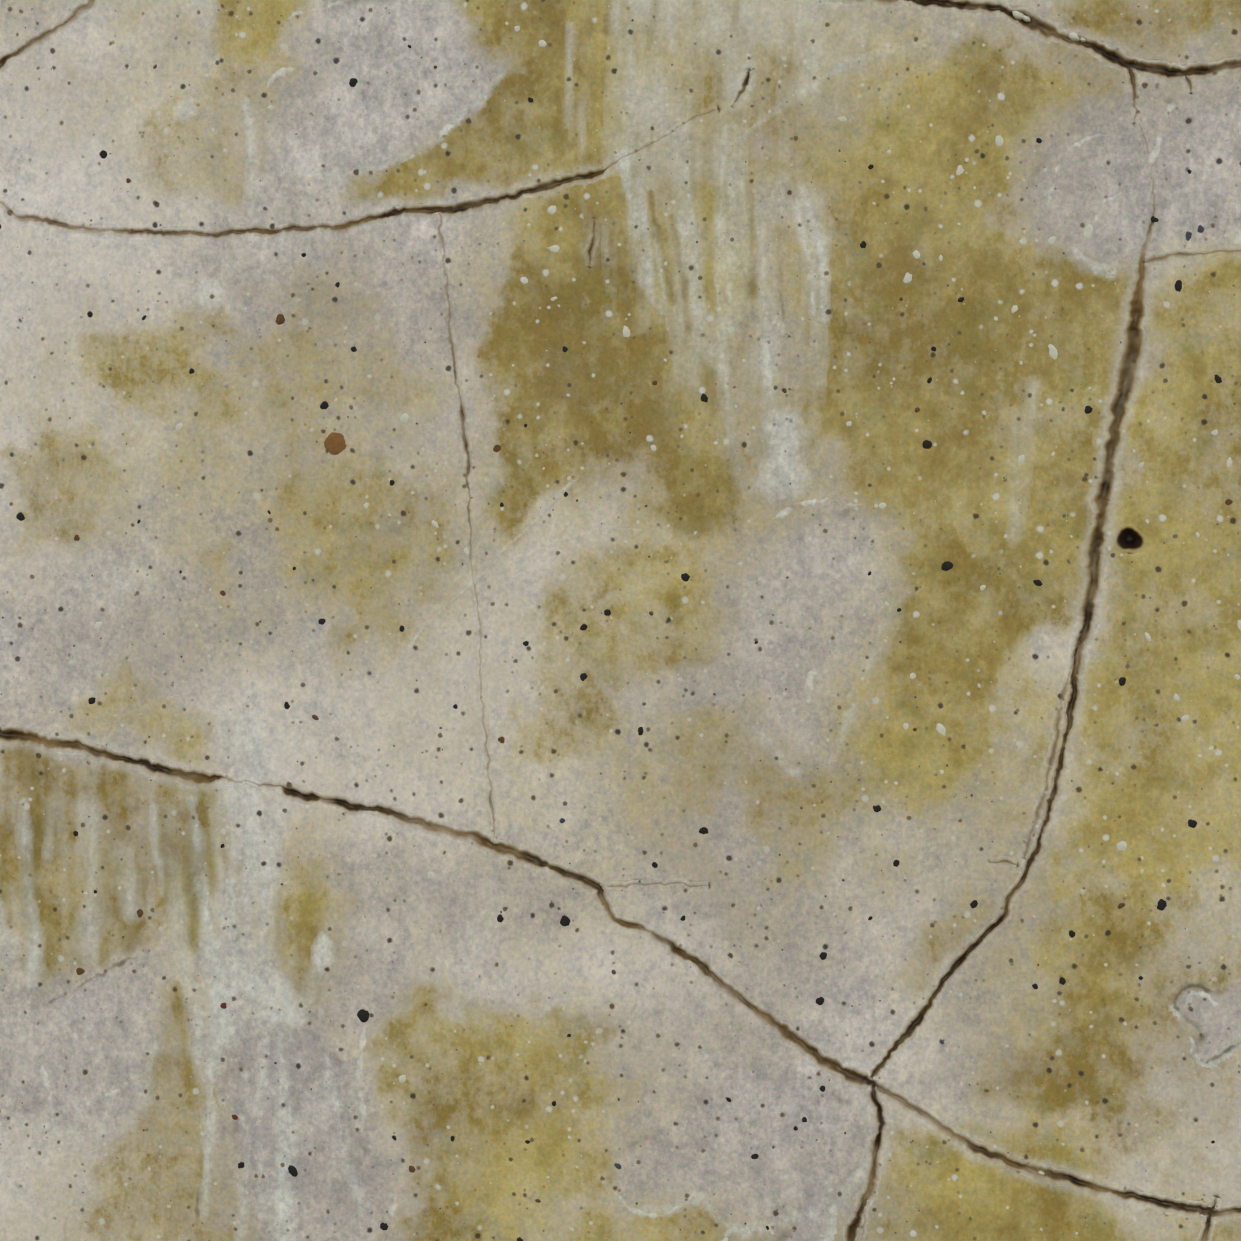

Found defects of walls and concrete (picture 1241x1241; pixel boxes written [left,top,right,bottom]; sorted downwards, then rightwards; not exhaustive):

crack [0,0,98,73]
crack [824,0,1241,123]
water stain [0,654,324,1241]
water stain [321,1052,371,1212]
crack [0,105,719,836]
water stain [355,965,626,1241]
water stain [0,0,1133,908]
crack [0,724,1241,1241]
peeling [601,1045,873,1241]
crack [868,121,1241,1080]
water stain [874,256,1241,1241]
peeling [1168,975,1241,1070]